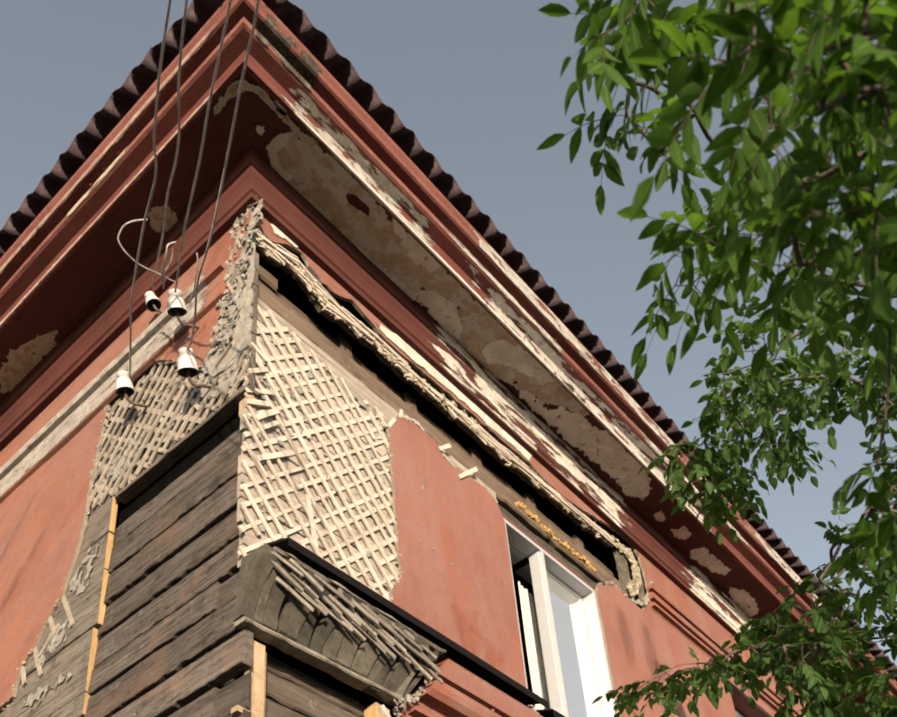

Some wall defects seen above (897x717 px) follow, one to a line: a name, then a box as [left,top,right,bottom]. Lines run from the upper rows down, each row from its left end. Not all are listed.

peeling [0,25,215,274]
peeling [0,79,711,607]
peeling [671,526,759,633]